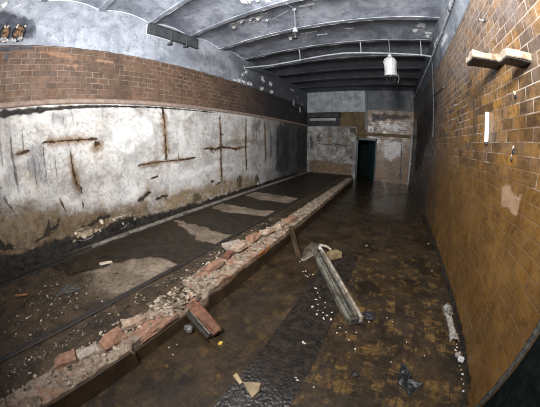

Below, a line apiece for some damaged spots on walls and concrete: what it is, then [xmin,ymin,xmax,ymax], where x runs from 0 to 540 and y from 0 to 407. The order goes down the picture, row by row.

water stain [0,11,36,39]
spalling [501,185,521,216]
spalling [72,213,136,243]
water stain [0,161,353,312]
water stain [42,312,191,407]